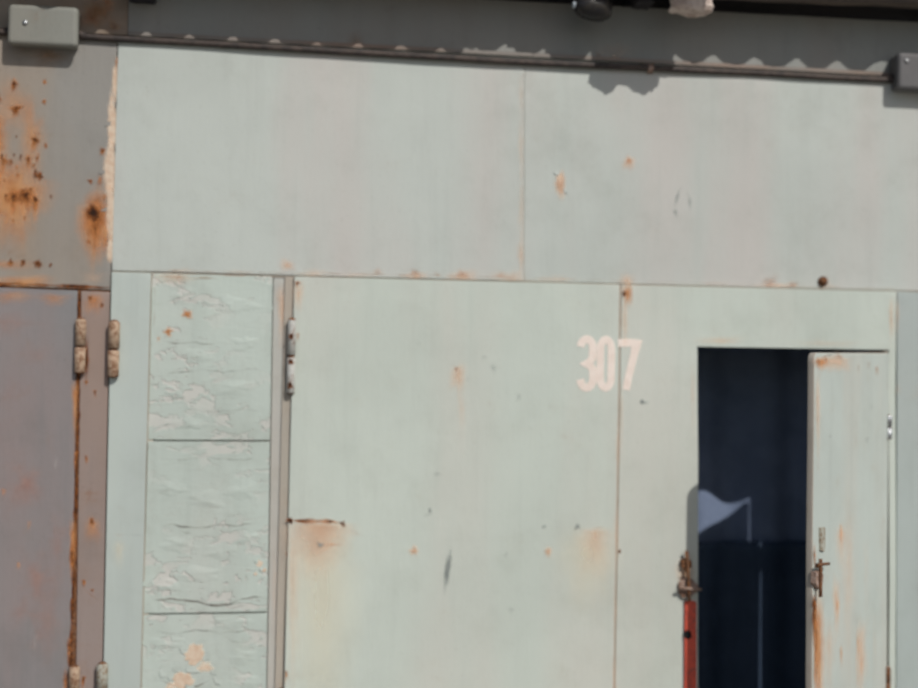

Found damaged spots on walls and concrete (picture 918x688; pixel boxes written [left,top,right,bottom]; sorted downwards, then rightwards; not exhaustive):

rust [0,133,47,221]
rust [84,195,107,247]
peeling [99,59,118,261]
rust [67,346,96,667]
rust [287,518,345,548]
rust [813,598,821,677]